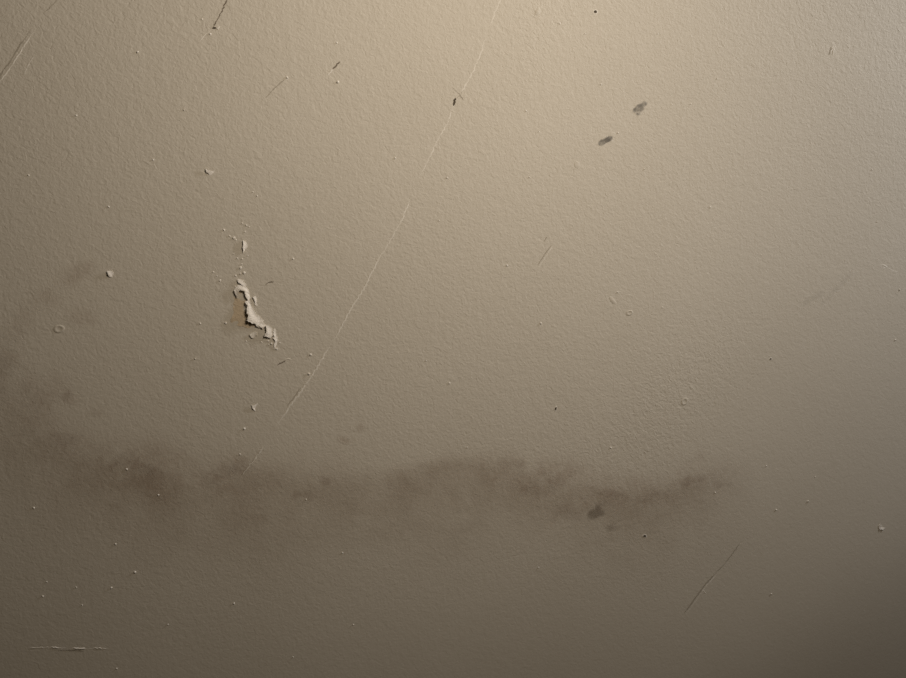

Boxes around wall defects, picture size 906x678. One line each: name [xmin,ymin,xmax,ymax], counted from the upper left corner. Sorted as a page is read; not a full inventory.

peeling [223,223,280,350]